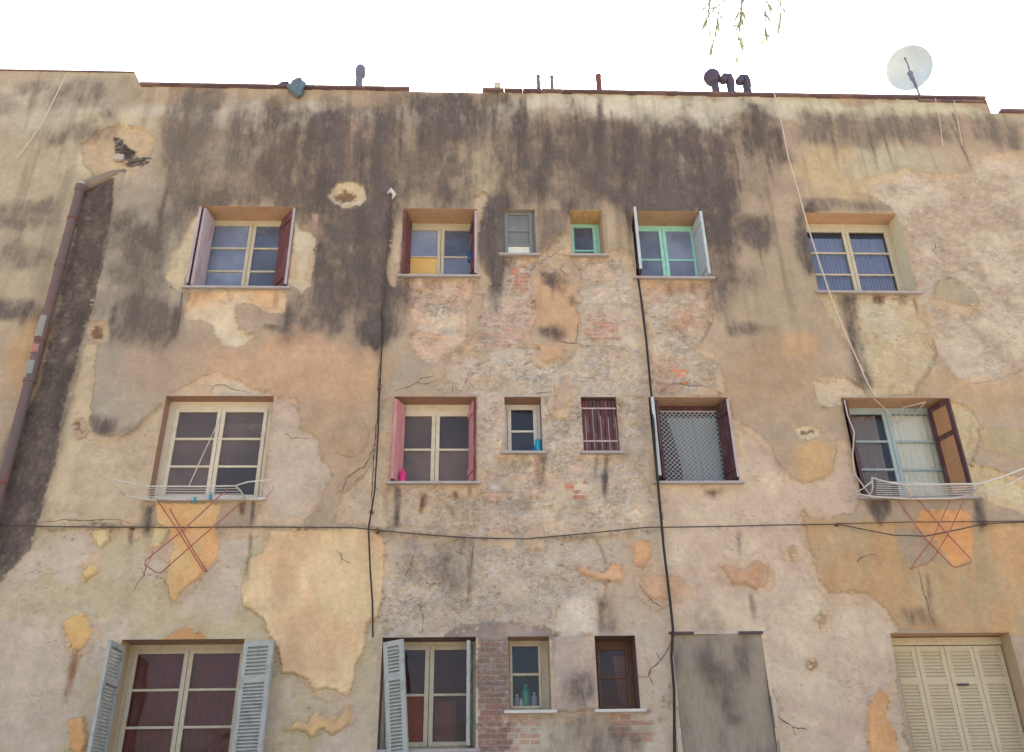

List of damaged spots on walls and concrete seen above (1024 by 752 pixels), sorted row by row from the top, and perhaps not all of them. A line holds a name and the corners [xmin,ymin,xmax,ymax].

flaking render [81,125,157,176]
damp [249,92,768,349]
damp [744,104,782,155]
damp [802,114,954,147]
damp [112,286,180,343]
damp [0,241,99,561]
crack [337,350,474,500]
flaking render [0,179,1024,752]